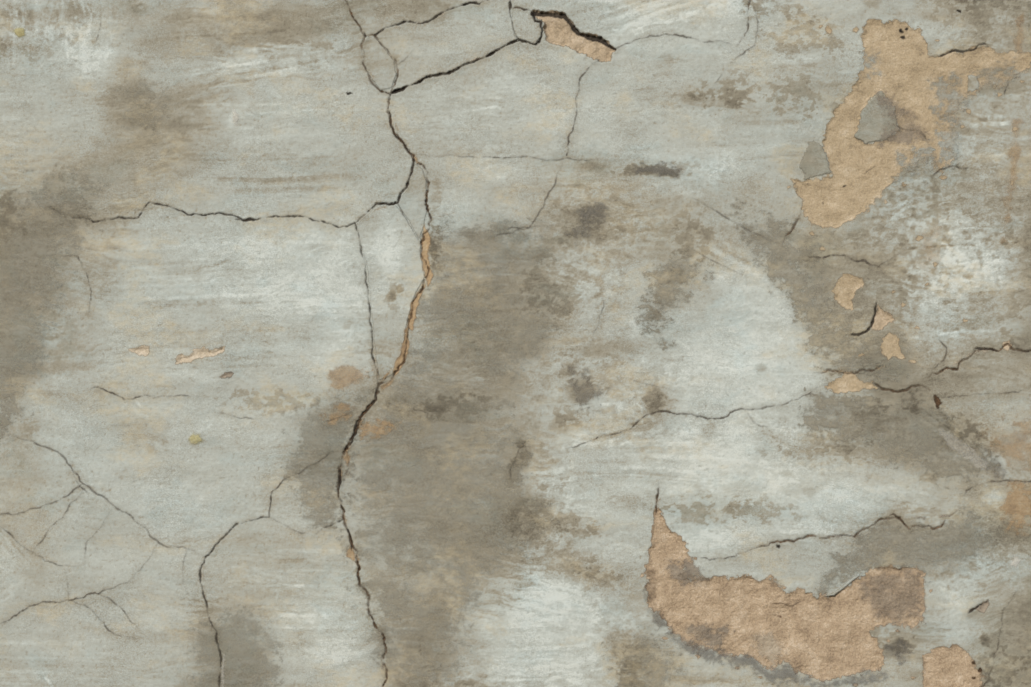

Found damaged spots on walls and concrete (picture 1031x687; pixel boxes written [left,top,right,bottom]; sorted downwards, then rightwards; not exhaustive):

spalling [512,7,616,62]
peeling [787,19,1031,235]
water stain [0,173,92,436]
crack [89,2,517,686]
water stain [637,249,713,350]
peeling [851,303,916,363]
crack [824,343,1031,392]
water stain [357,351,540,686]
crack [760,514,906,547]
crack [11,590,113,631]
peeling [640,491,932,686]
peeling [911,644,984,687]